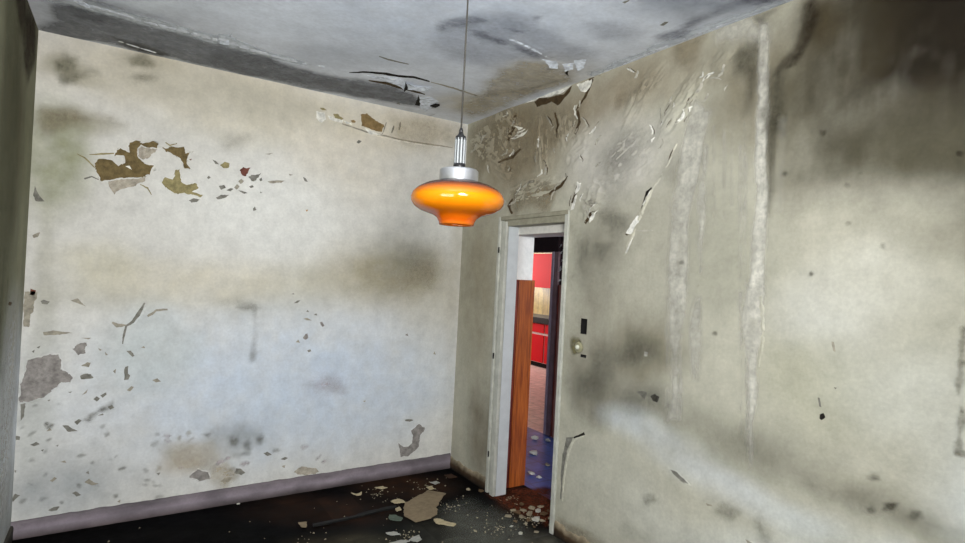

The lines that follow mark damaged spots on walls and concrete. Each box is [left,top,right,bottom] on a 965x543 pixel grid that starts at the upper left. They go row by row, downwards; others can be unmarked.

damp [787,2,816,63]
peeling [508,0,793,149]
spalling [78,139,204,203]
spalling [213,160,308,199]
peeling [316,108,385,143]
peeling [500,112,527,172]
peeling [550,173,597,223]
spalling [18,338,114,420]
spalling [113,346,145,391]
spalling [397,419,425,457]
peeling [560,432,585,501]